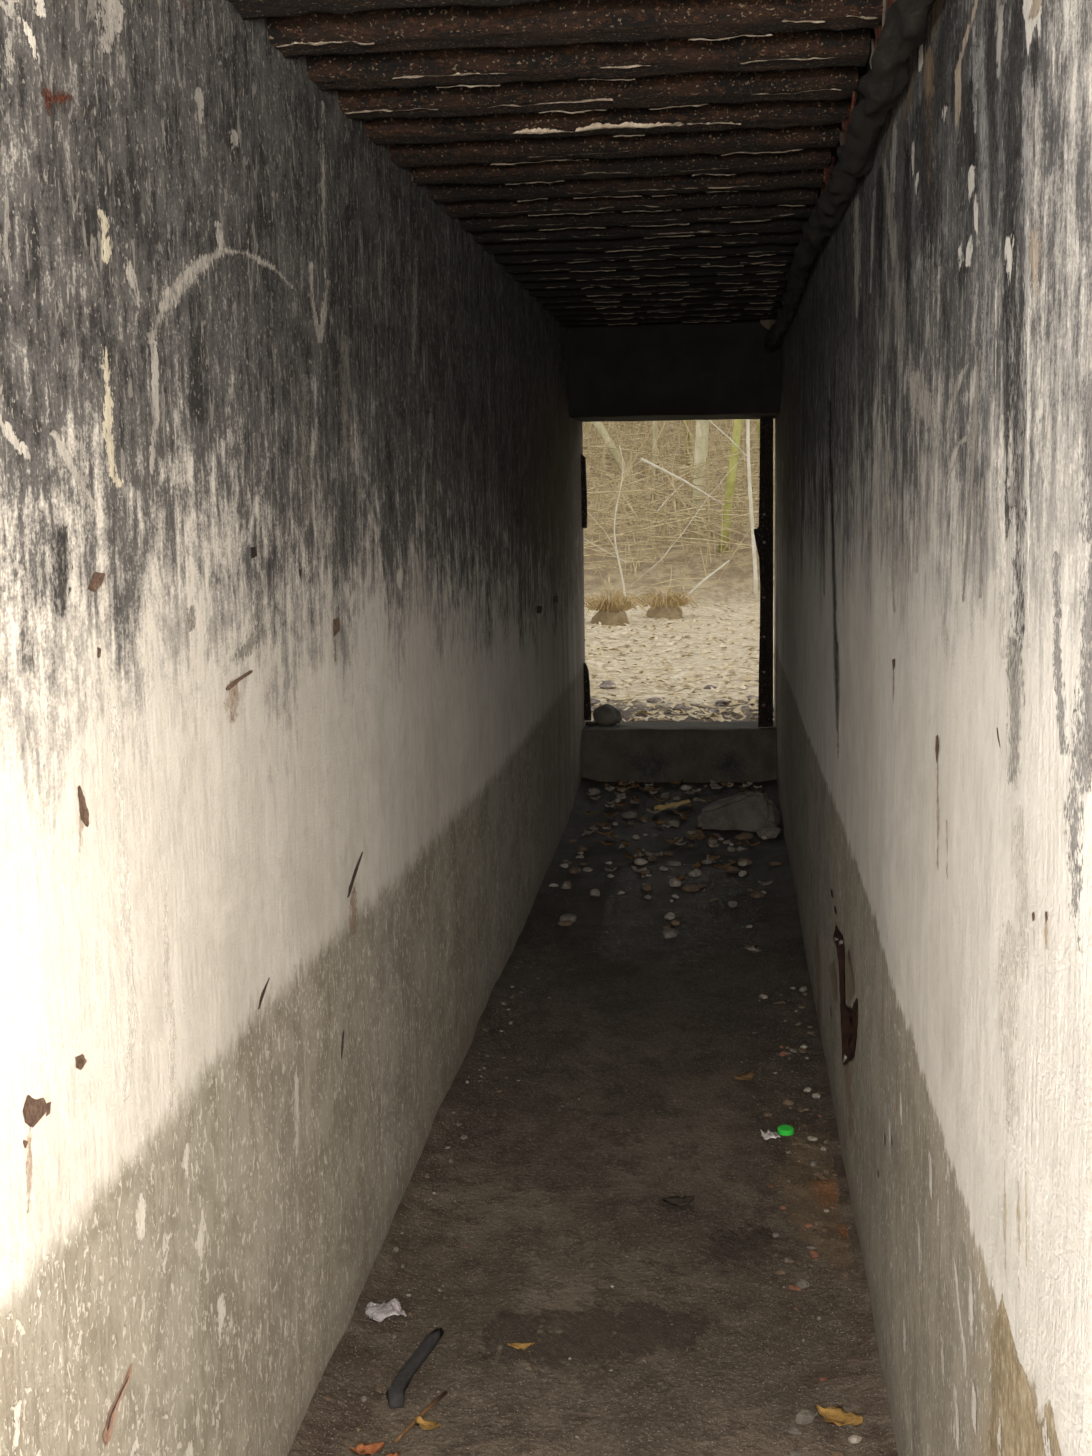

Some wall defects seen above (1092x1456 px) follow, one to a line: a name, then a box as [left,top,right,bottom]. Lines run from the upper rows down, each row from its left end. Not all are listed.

corrosion [838,0,896,146]
corrosion [918,43,935,185]
peeling [993,0,1004,78]
spalling [1022,0,1042,56]
damp [337,334,351,470]
damp [409,259,420,374]
damp [876,118,941,561]
damp [954,0,1040,781]
damp [51,526,73,616]
damp [821,399,840,757]
damp [224,591,266,723]
damp [1052,552,1070,756]